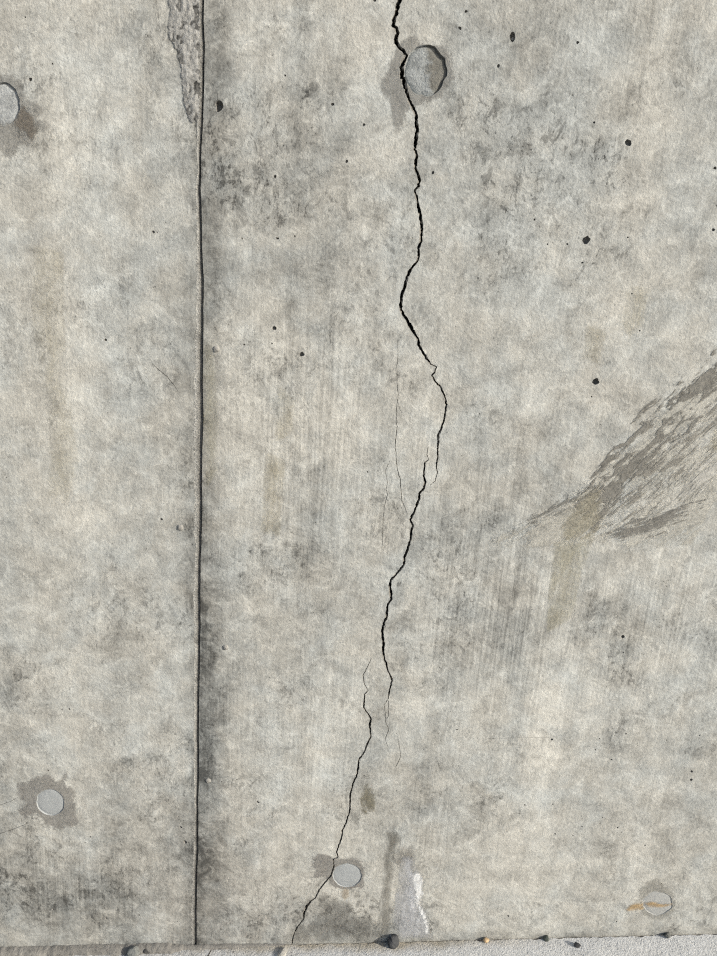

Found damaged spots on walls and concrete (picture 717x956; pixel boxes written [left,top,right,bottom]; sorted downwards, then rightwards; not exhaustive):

crack [291,0,448,944]
water stain [386,859,428,937]